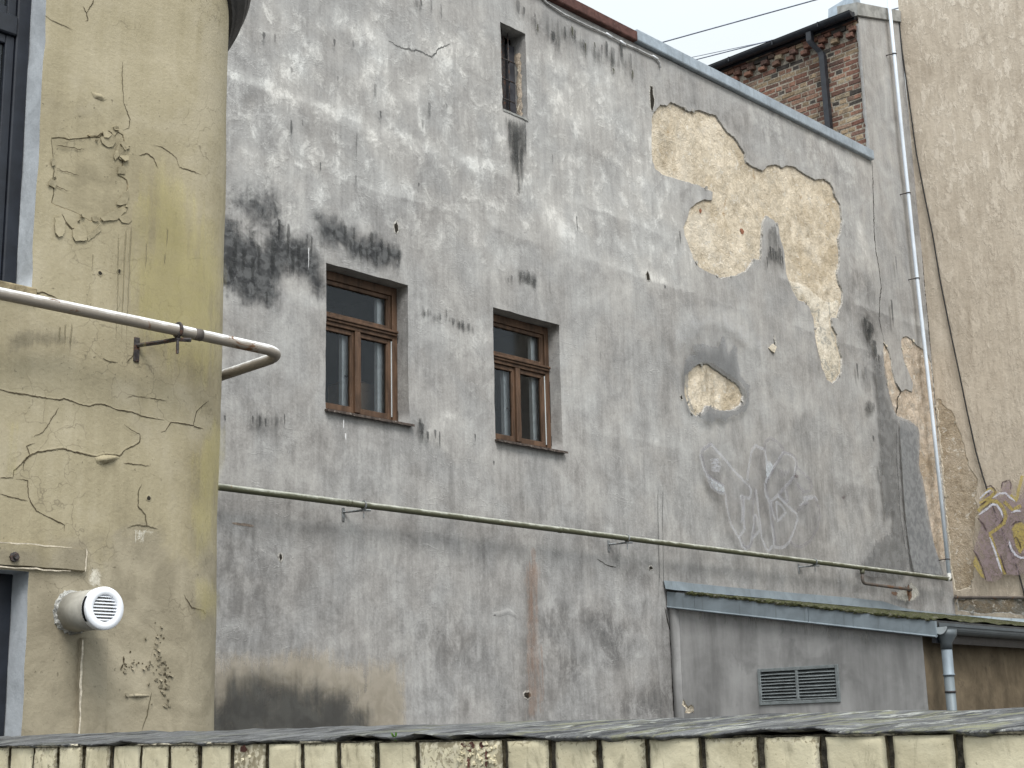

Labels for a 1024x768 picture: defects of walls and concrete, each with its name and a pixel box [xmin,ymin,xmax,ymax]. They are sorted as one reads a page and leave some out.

crack [390,41,448,58]
crack [122,62,131,130]
flaking render [48,126,132,241]
crack [139,145,199,174]
damp [510,122,526,172]
damp [223,197,322,305]
damp [315,215,401,266]
spalling [649,85,843,383]
spalling [679,363,744,417]
crack [0,387,208,529]
flaking render [883,336,1024,615]
damp [214,652,404,731]